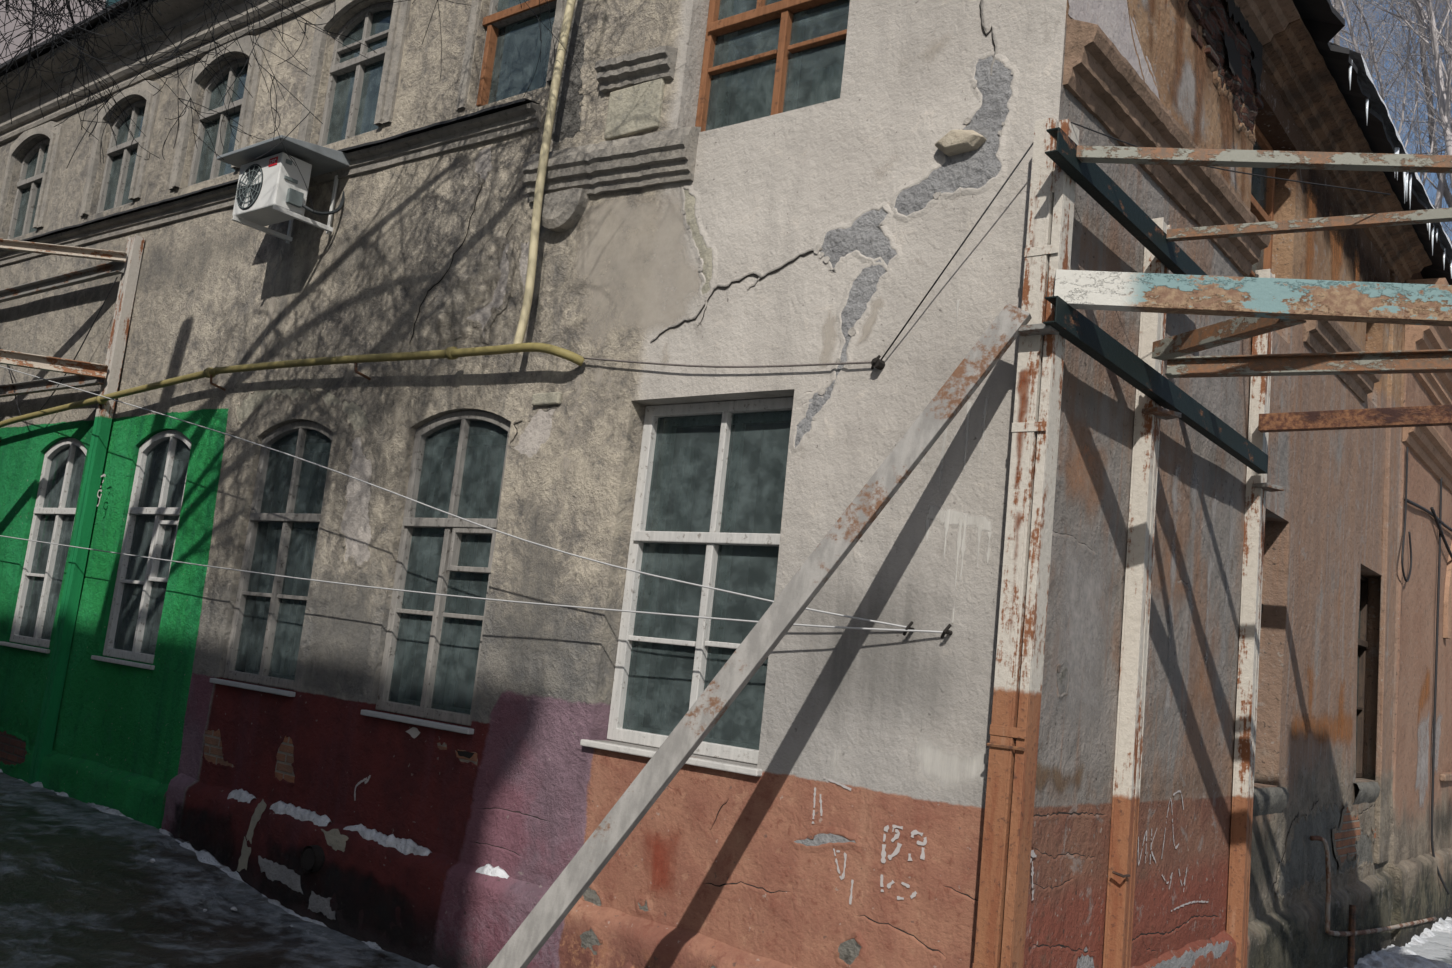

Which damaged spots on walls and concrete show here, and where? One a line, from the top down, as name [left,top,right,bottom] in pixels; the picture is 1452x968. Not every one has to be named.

crack [979,0,1000,76]
flaking render [1186,0,1264,145]
crack [650,247,823,342]
spalling [789,50,1020,454]
corrosion [1016,370,1030,486]
flaking render [272,731,298,788]
spalling [237,800,336,920]
spalling [321,829,349,852]
leakage [1250,832,1274,885]
peeling [1274,798,1377,903]
spalling [1151,941,1229,968]